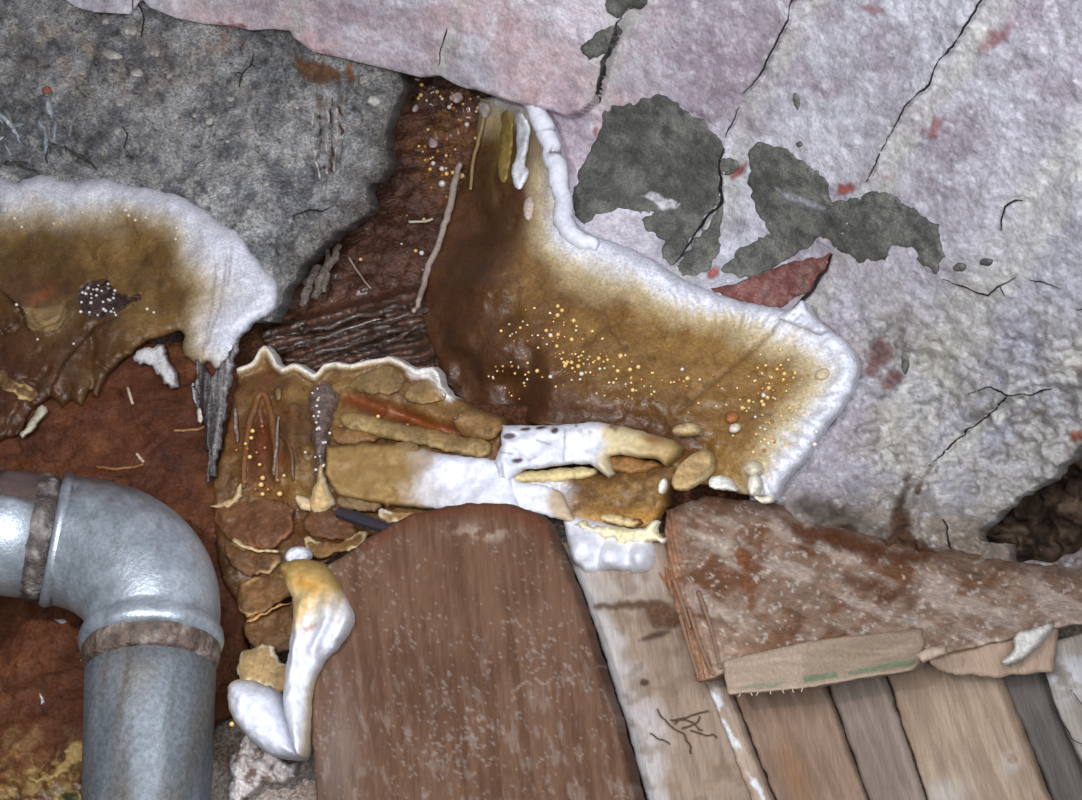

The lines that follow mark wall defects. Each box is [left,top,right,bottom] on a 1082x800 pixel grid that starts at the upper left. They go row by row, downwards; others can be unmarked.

crack [595,17,623,103]
crack [673,0,793,266]
crack [866,0,982,182]
peeling [0,0,491,372]
peeling [838,184,854,194]
leakage [77,279,141,320]
spalling [708,252,831,308]
leakage [308,380,340,480]
spalling [986,459,1082,563]
leakage [595,600,679,639]